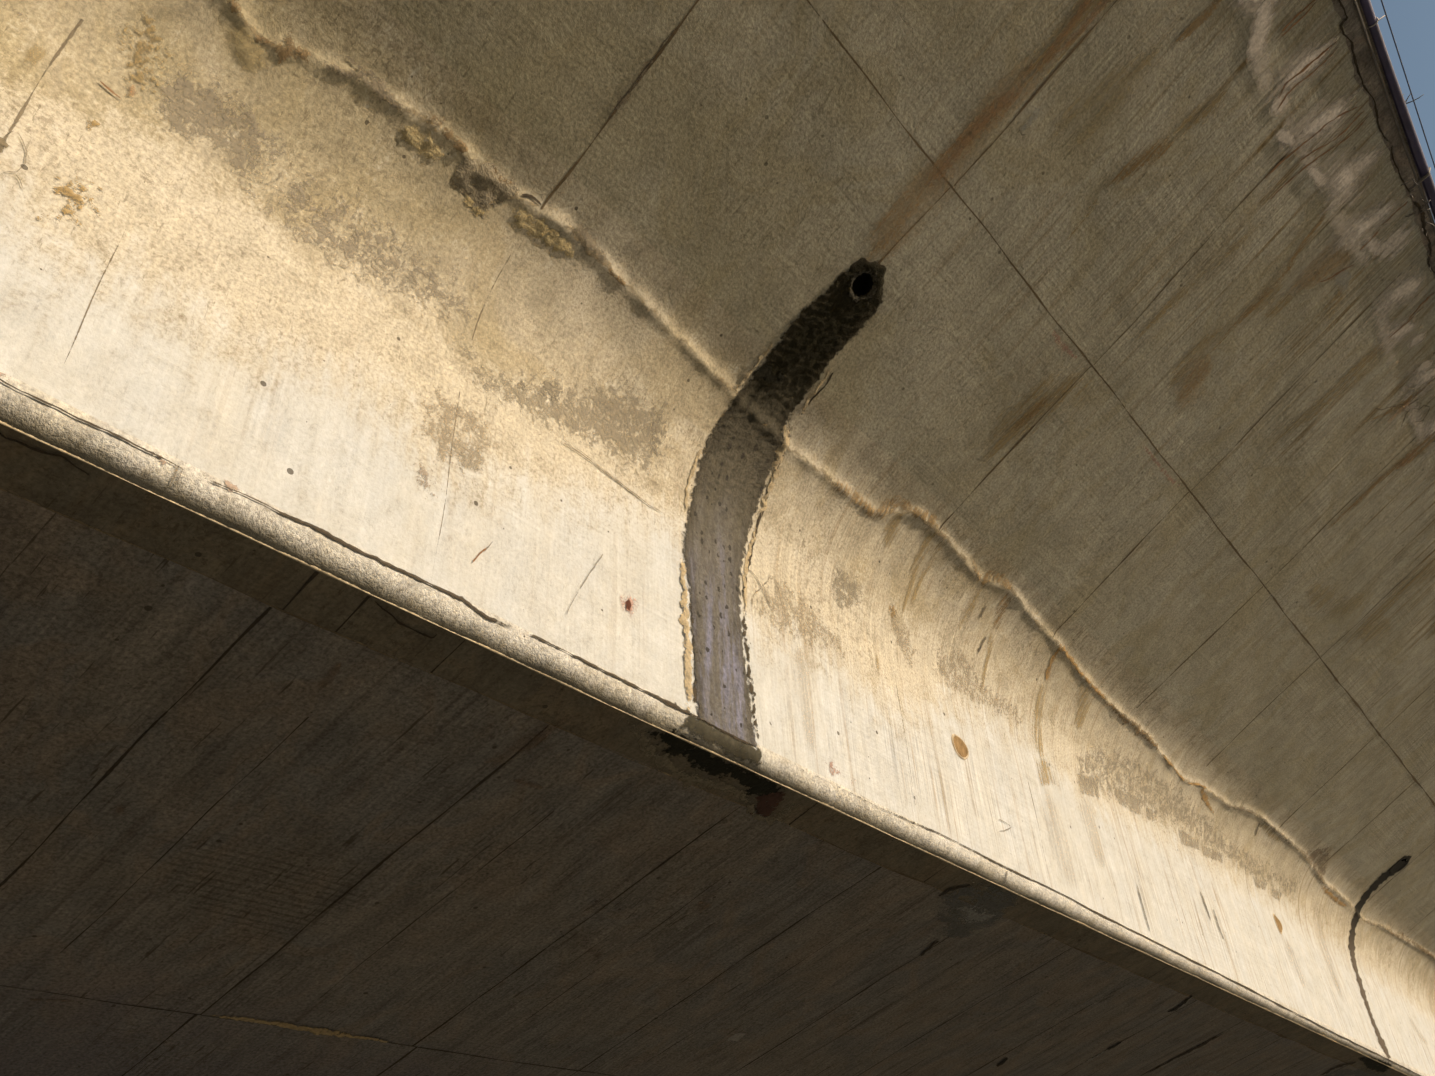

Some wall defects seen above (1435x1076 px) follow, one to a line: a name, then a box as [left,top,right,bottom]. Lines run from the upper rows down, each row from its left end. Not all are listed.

corrosion [1278,42,1339,109]
corrosion [1267,107,1369,199]
water stain [1231,0,1412,265]
water stain [1372,272,1426,361]
water stain [1401,360,1435,444]
crack [0,379,752,745]
crack [839,787,1421,1076]